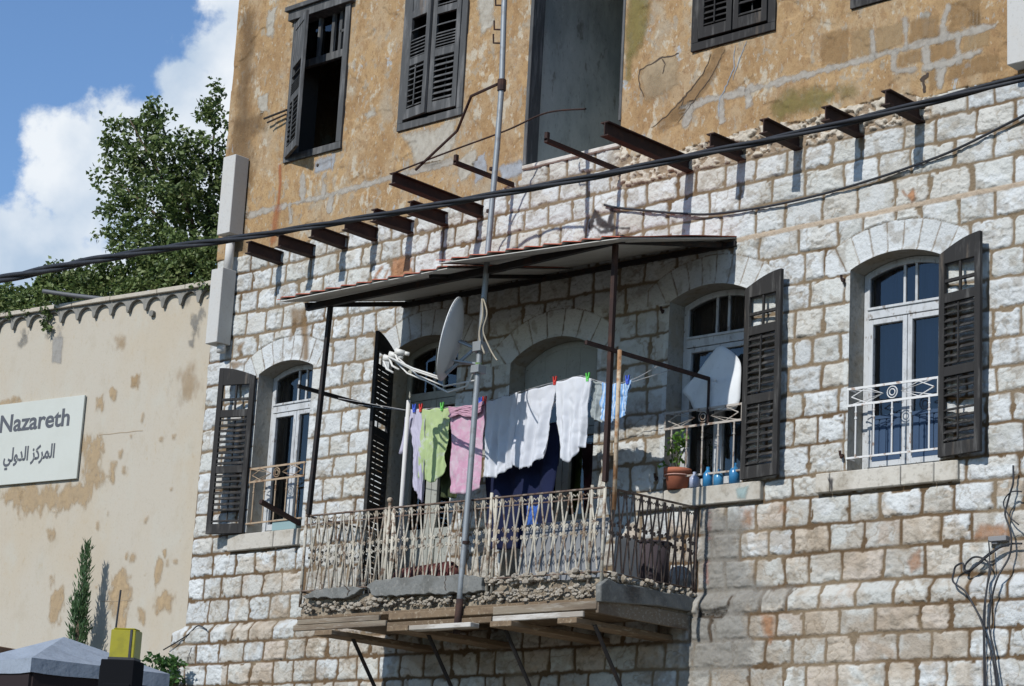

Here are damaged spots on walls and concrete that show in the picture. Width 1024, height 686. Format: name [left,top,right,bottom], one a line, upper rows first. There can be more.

crack [638,53,679,97]
crack [651,43,746,128]
flaking render [679,0,997,127]
flaking render [500,160,523,179]
peeling [96,387,116,411]
peeling [5,436,125,514]
peeling [110,549,176,628]
spalling [300,567,697,614]